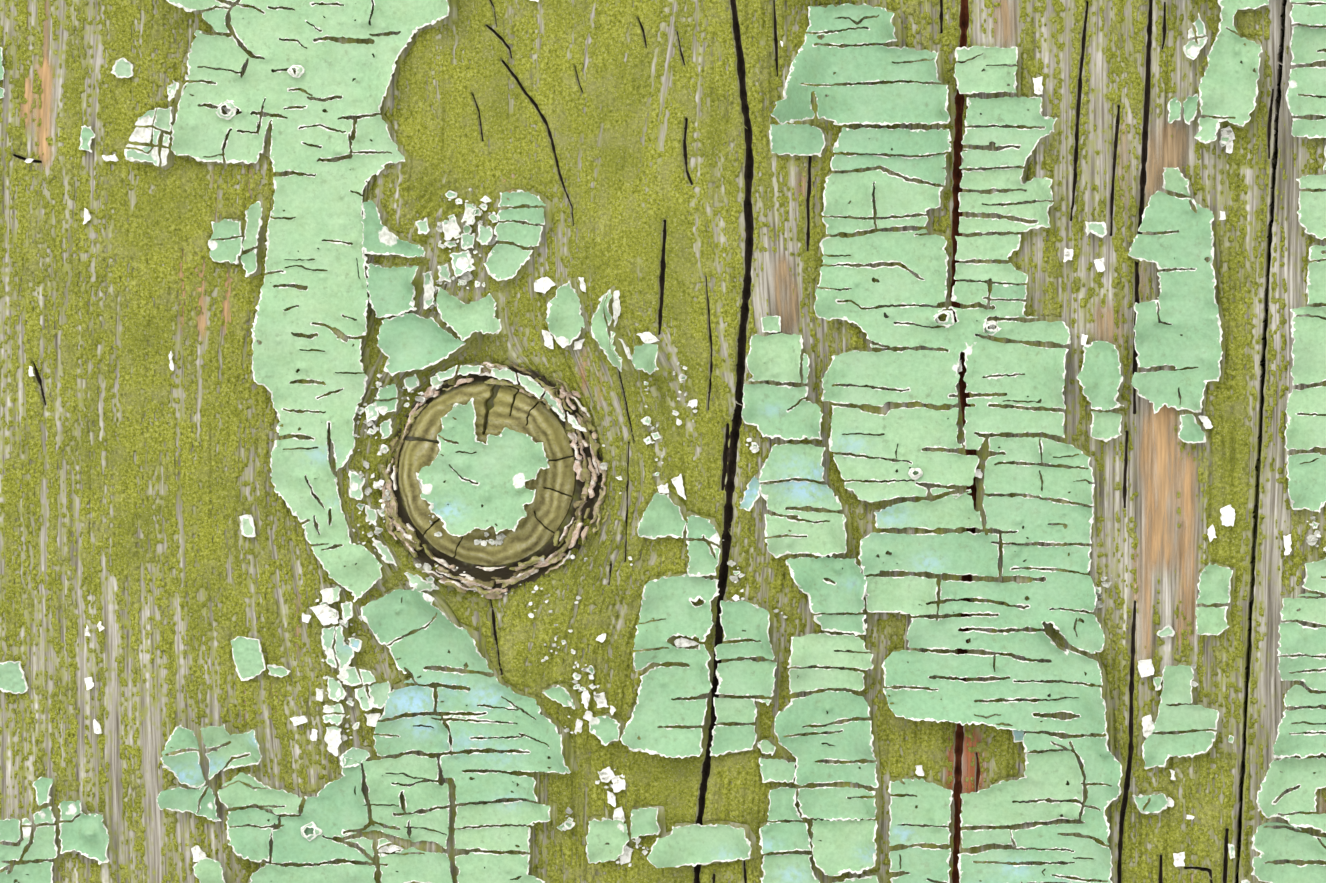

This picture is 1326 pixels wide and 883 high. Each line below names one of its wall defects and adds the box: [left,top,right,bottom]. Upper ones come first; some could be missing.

crack [486,0,574,226]
peeling [1168,0,1269,153]
peeling [79,0,1123,883]
crack [696,0,778,825]
crack [939,0,977,534]
peeling [1076,167,1226,443]
peeling [1241,0,1326,883]
peeling [0,777,109,883]
crack [694,860,747,883]
crack [957,574,972,682]
crack [952,723,981,883]
peeling [1138,659,1234,780]